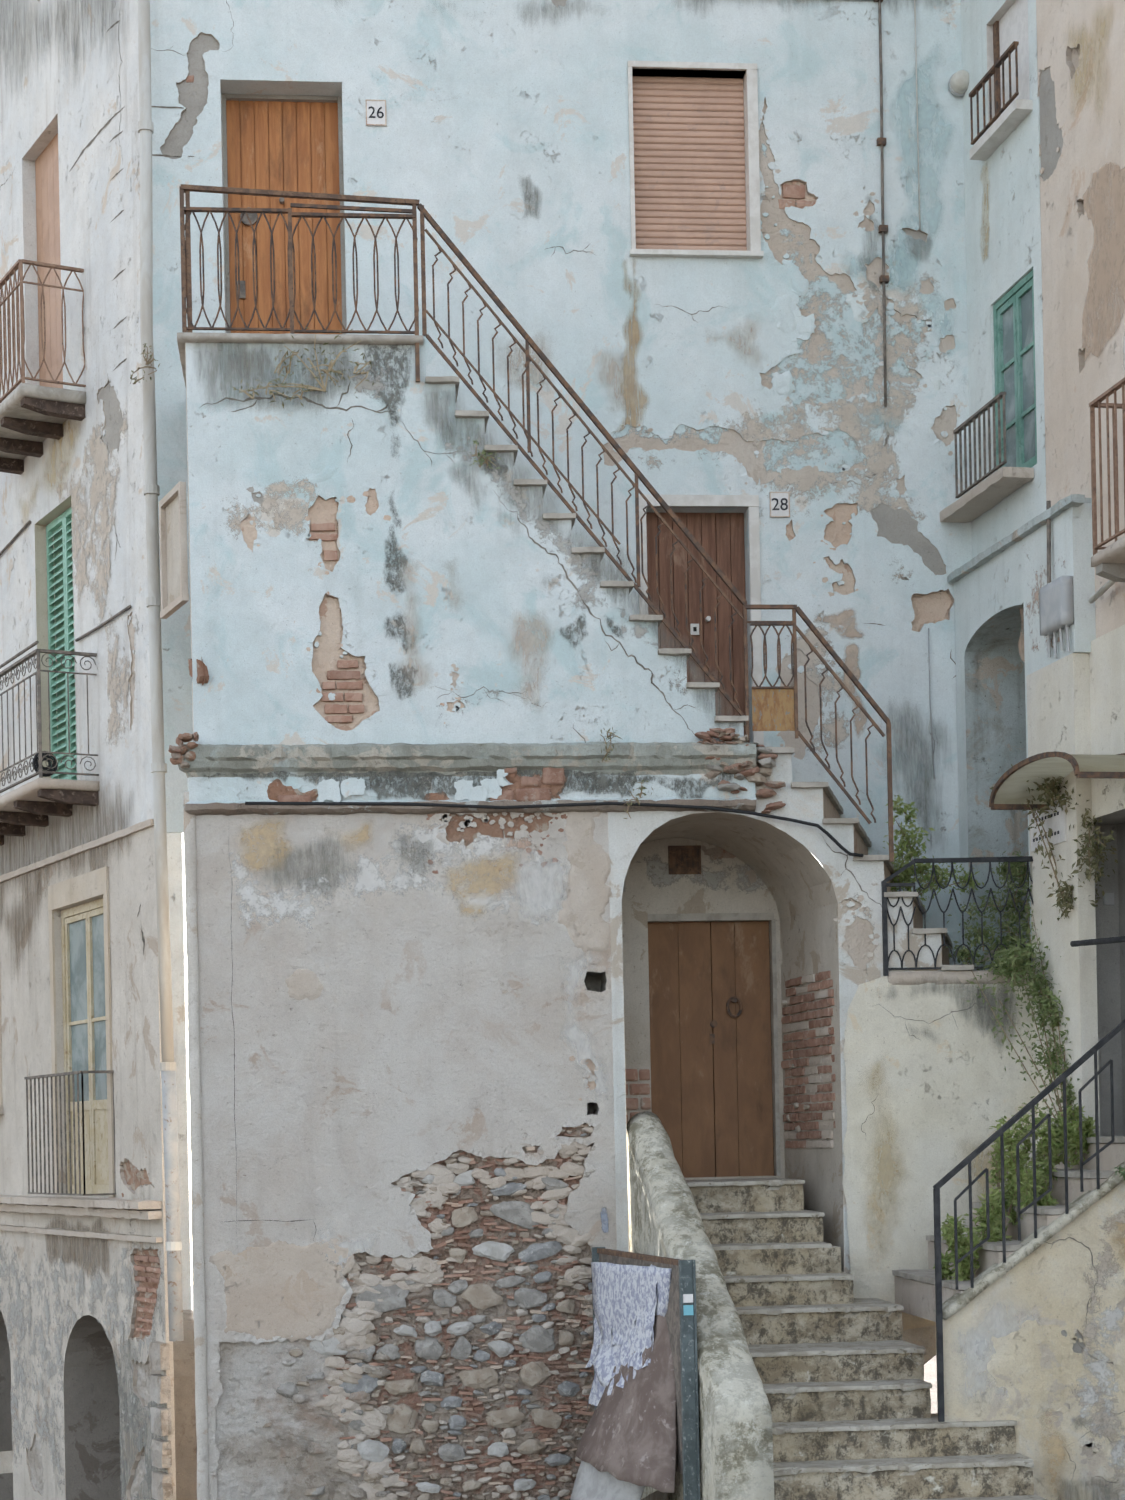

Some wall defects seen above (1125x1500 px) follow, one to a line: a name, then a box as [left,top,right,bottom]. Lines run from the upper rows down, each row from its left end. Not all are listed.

flaking render [160,33,220,159]
flaking render [1039,68,1063,181]
leakage [365,345,411,423]
flaking render [599,99,960,597]
flaking render [227,479,391,731]
leakage [385,503,407,591]
leakage [386,616,417,697]
crack [493,489,695,735]
flaking render [893,567,953,632]
flaking render [230,769,568,933]
crack [1046,1237,1114,1365]
peeling [1045,1210,1125,1500]